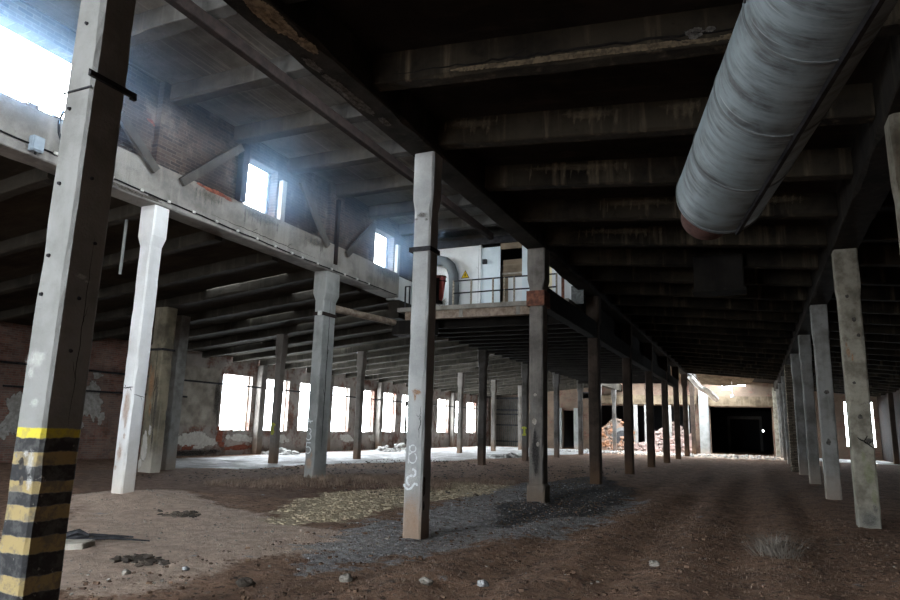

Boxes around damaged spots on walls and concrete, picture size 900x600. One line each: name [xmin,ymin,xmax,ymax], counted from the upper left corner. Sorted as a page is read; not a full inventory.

spalling [243,0,319,54]
peeling [0,391,23,440]
peeling [81,372,105,428]
peeling [178,426,252,450]